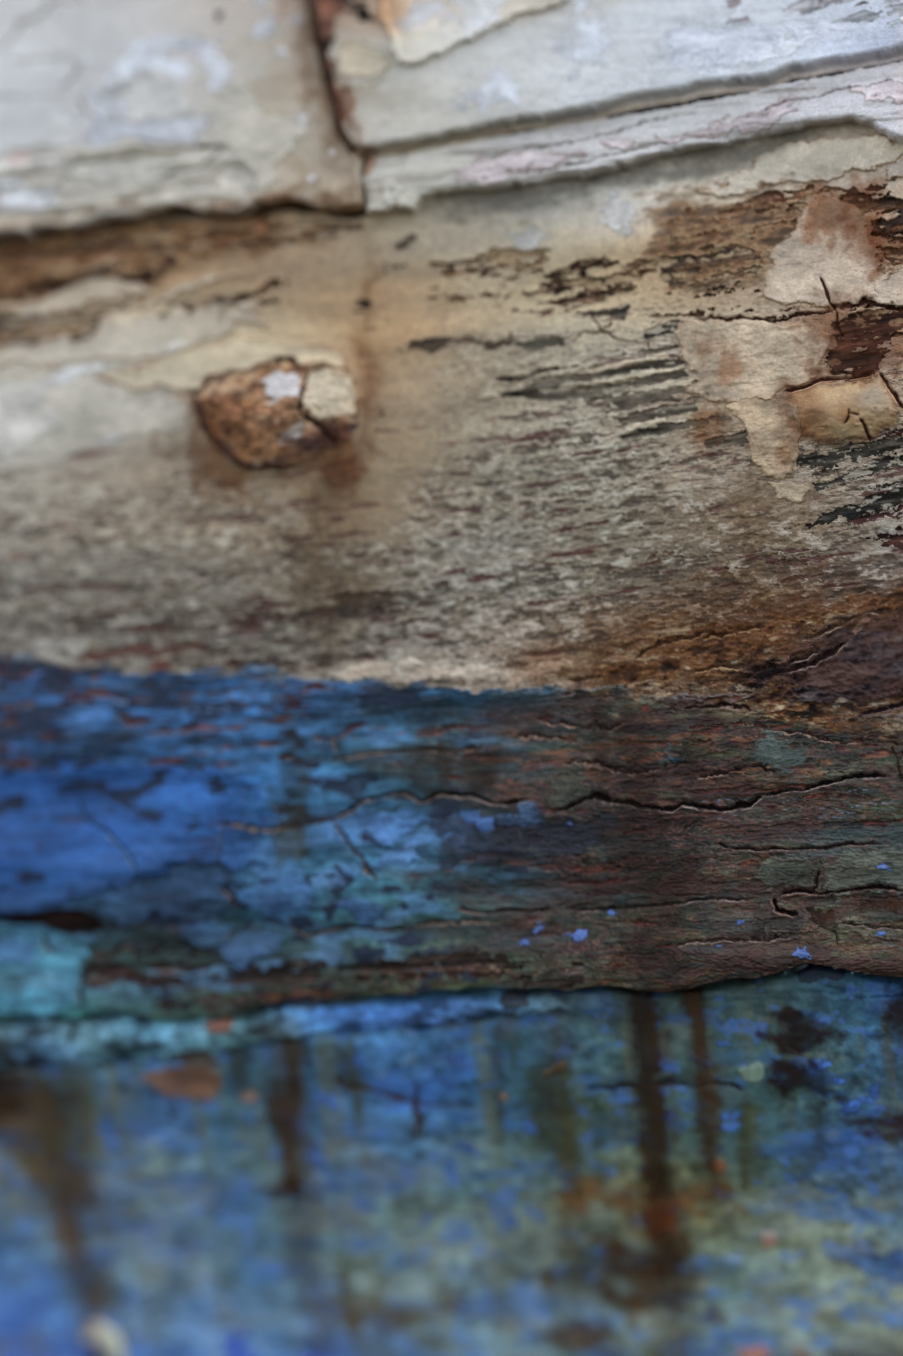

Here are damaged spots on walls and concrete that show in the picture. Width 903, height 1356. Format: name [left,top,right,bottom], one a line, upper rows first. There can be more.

peeling [662,0,903,74]
crack [451,113,694,182]
peeling [655,93,801,145]
crack [765,79,890,110]
peeling [0,35,365,473]
peeling [399,132,903,549]
crack [123,718,199,735]
crack [217,610,903,948]
peeling [0,760,618,1034]
peeling [737,845,903,983]
crack [41,935,85,1046]
peeling [111,1049,223,1102]